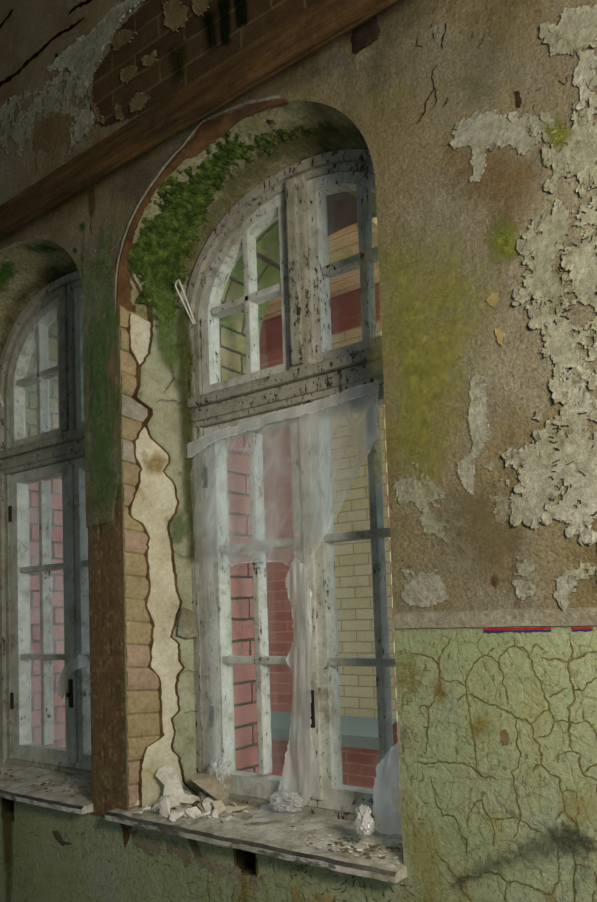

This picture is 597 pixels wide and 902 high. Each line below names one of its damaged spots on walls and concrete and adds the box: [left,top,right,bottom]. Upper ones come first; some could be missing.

crack [0,0,92,87]
spalling [0,0,317,157]
peeling [450,4,597,546]
spalling [88,95,289,817]
peeling [393,462,449,546]
peeling [401,569,449,607]
peeling [512,553,537,600]
peeling [554,559,597,611]
crack [292,864,407,902]